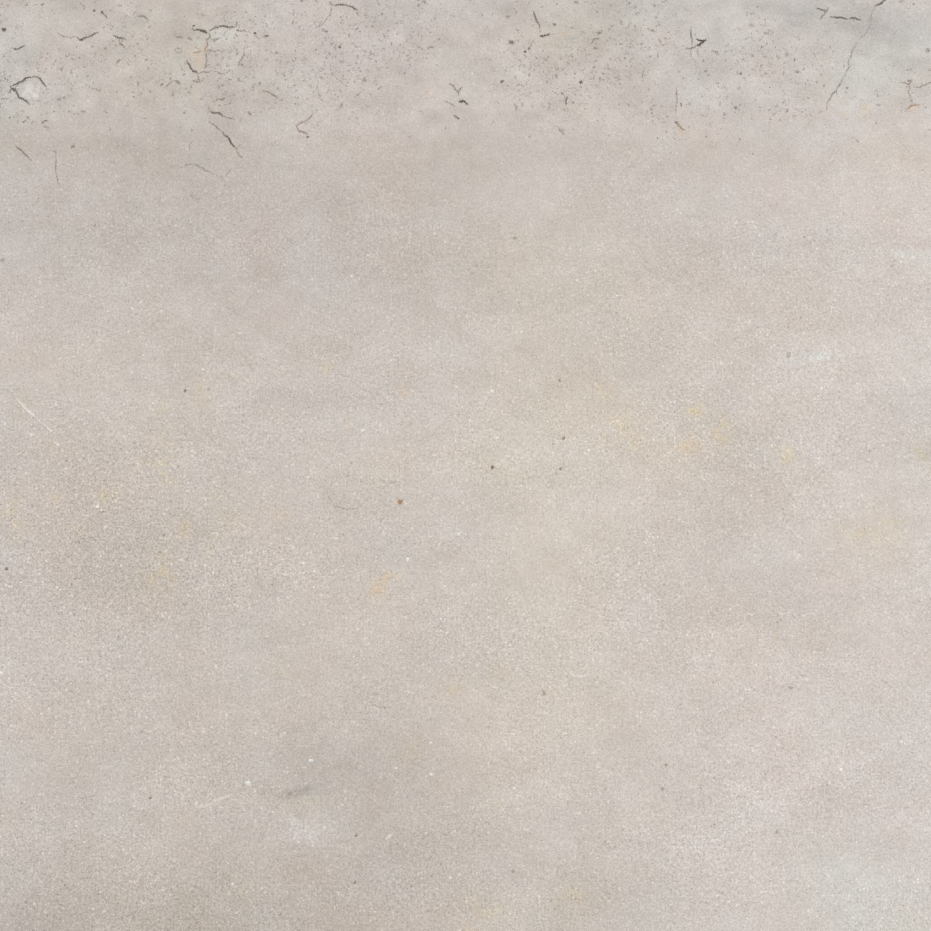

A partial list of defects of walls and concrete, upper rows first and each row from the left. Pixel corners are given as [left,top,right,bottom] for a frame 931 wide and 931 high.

crack [57,9,125,49]
crack [166,24,268,86]
crack [817,0,885,103]
crack [182,99,249,181]
crack [292,114,312,145]